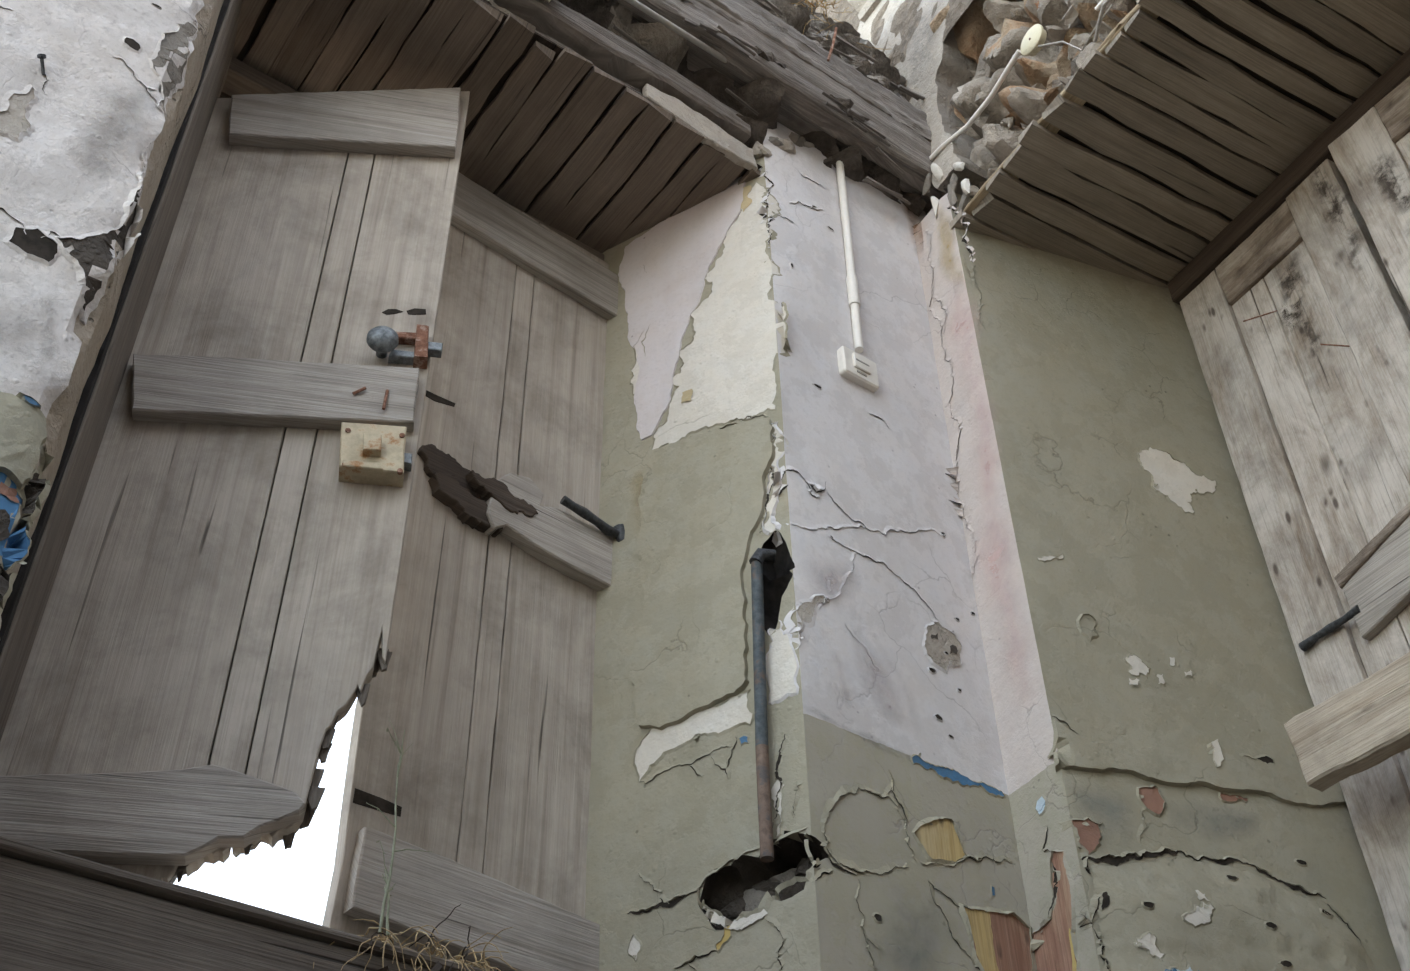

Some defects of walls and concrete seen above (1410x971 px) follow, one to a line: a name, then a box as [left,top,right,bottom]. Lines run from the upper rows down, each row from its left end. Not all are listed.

peeling [0,84,38,143]
crack [41,69,49,95]
crack [113,55,156,100]
spalling [148,20,198,118]
spalling [53,137,154,326]
peeling [0,444,54,628]
peeling [650,182,794,547]
crack [667,204,986,672]
peeling [1137,447,1217,515]
peeling [910,753,1005,799]
peeling [958,794,1104,971]
crack [884,770,1365,971]